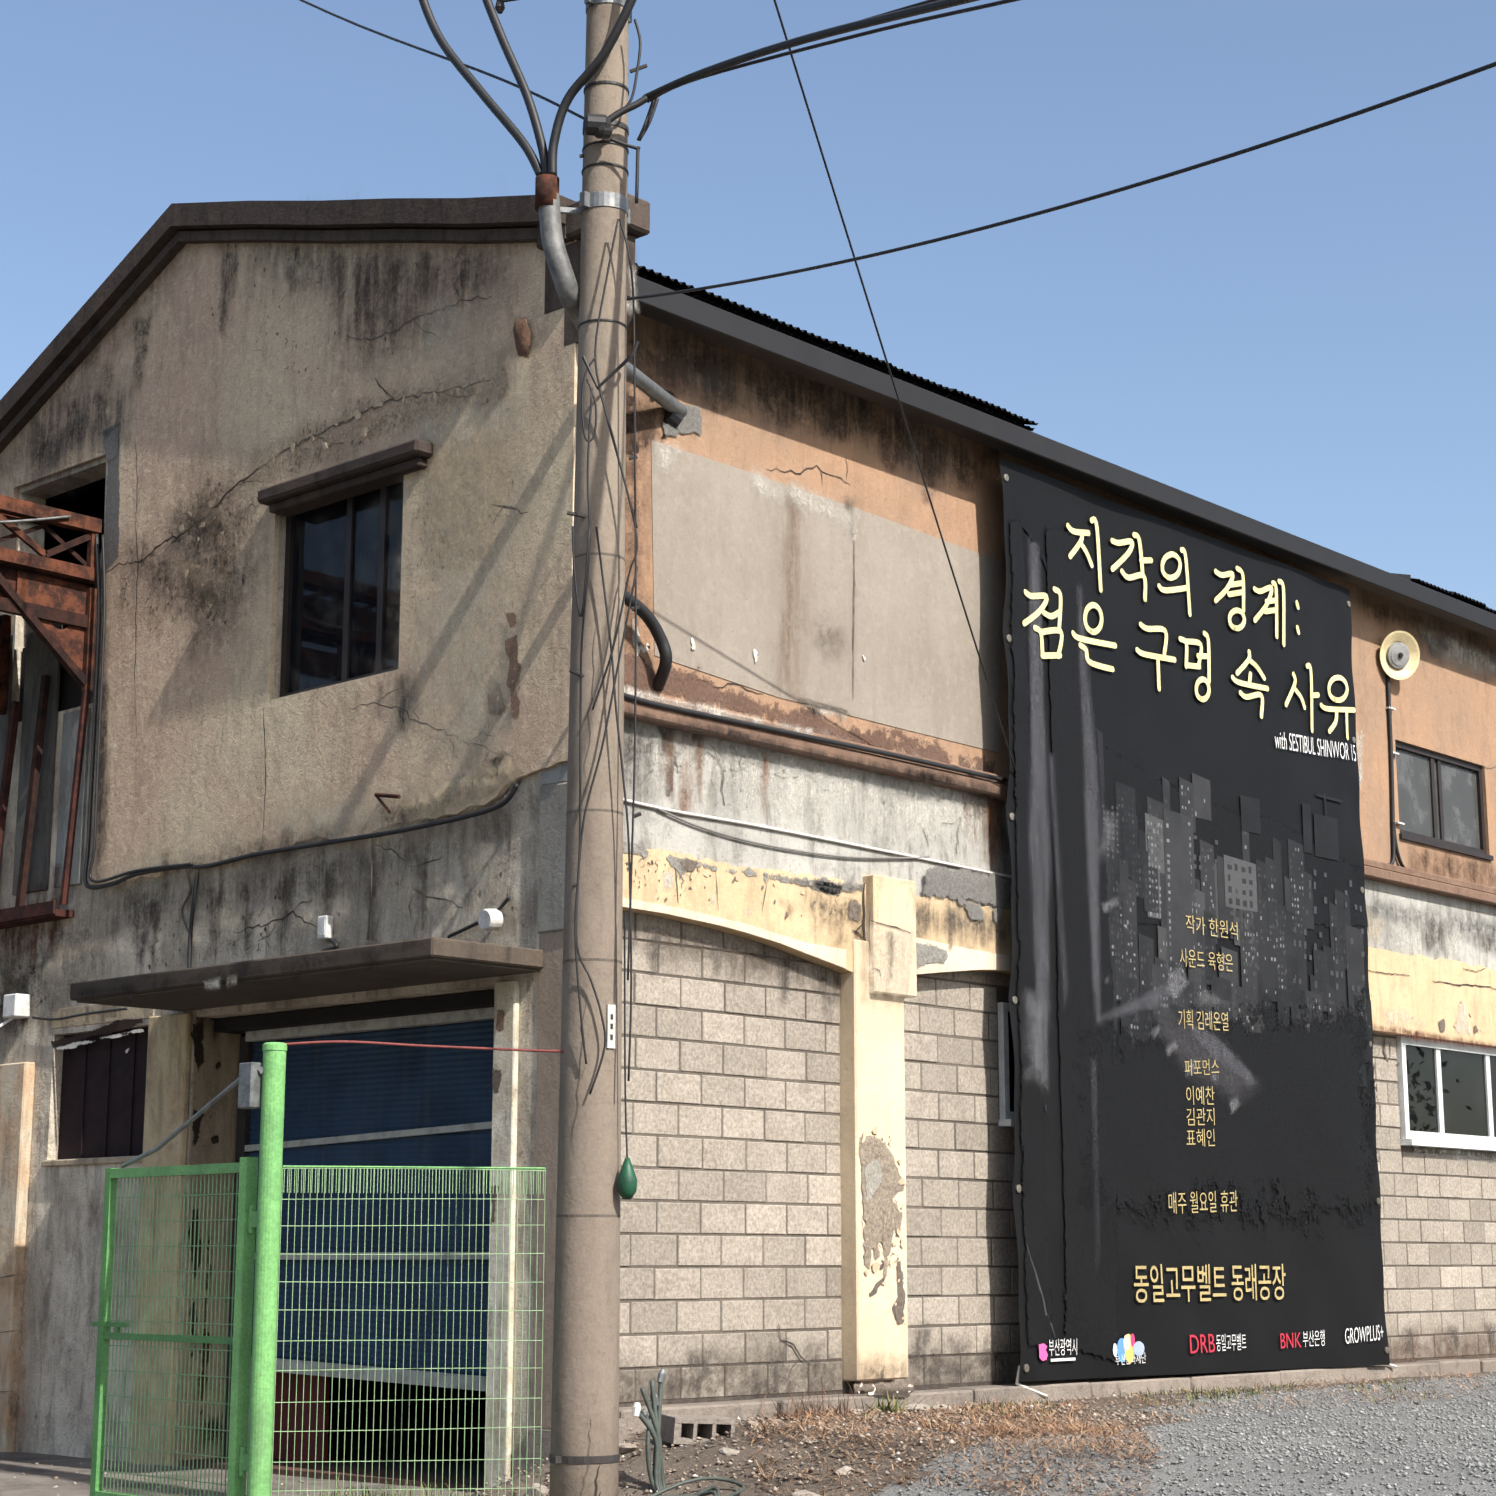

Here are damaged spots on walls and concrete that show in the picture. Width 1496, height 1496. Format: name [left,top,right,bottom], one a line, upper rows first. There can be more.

water stain [254,243,493,373]
water stain [625,336,944,500]
crack [768,461,851,485]
water stain [121,478,252,648]
crack [101,378,491,735]
flaking render [624,619,996,782]
crack [233,900,316,941]
rust [681,736,701,811]
peeling [623,842,864,919]
rust [988,803,999,855]
water stain [1372,906,1496,950]
peeling [859,1126,906,1325]